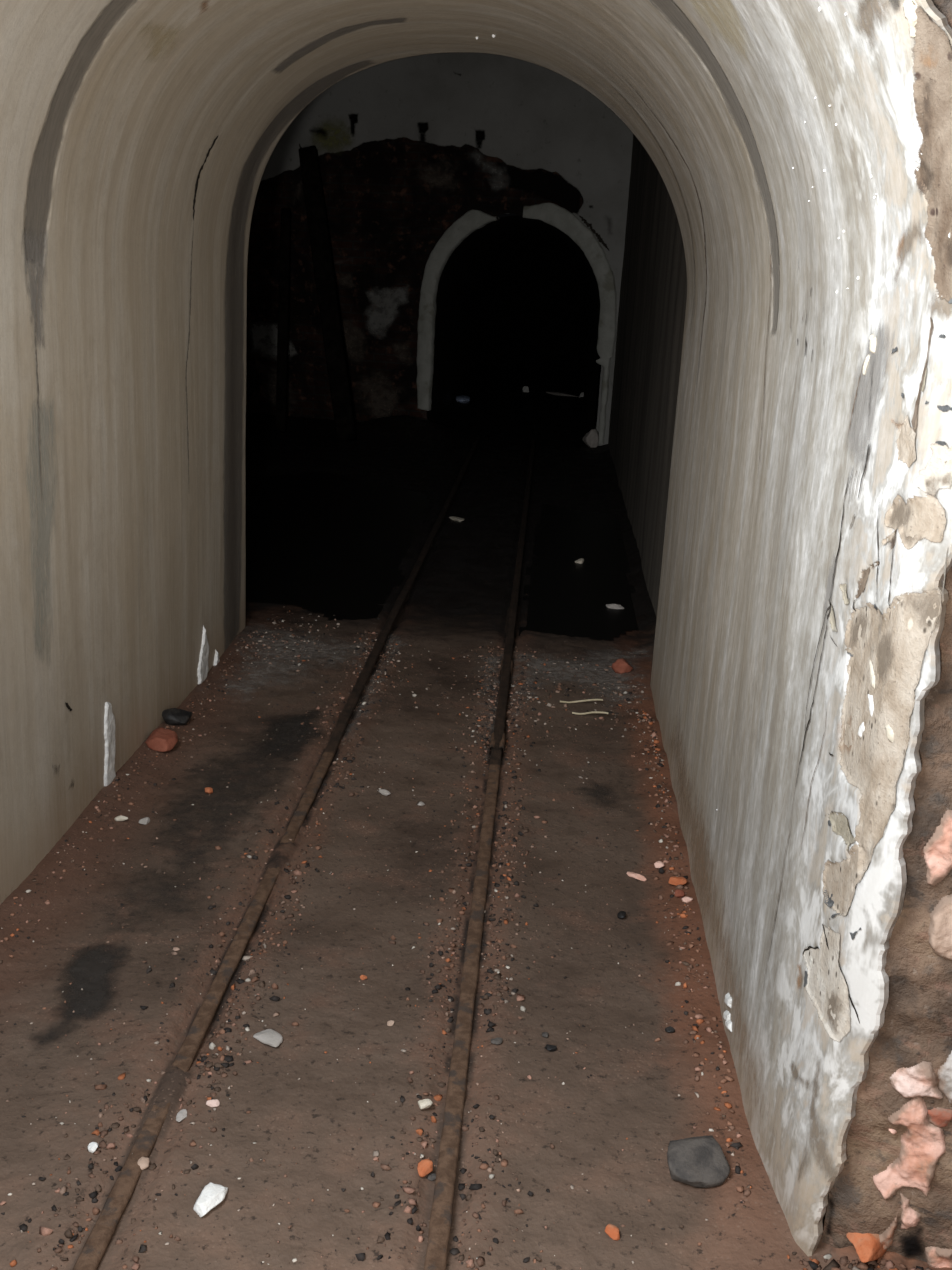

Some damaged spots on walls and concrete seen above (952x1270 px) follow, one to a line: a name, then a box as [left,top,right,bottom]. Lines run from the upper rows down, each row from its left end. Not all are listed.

spalling [903,0,952,304]
spalling [881,415,952,549]
crack [763,328,894,988]
spalling [797,561,942,1042]
spalling [923,810,952,960]
spalling [873,1050,952,1250]
spalling [924,1246,952,1268]